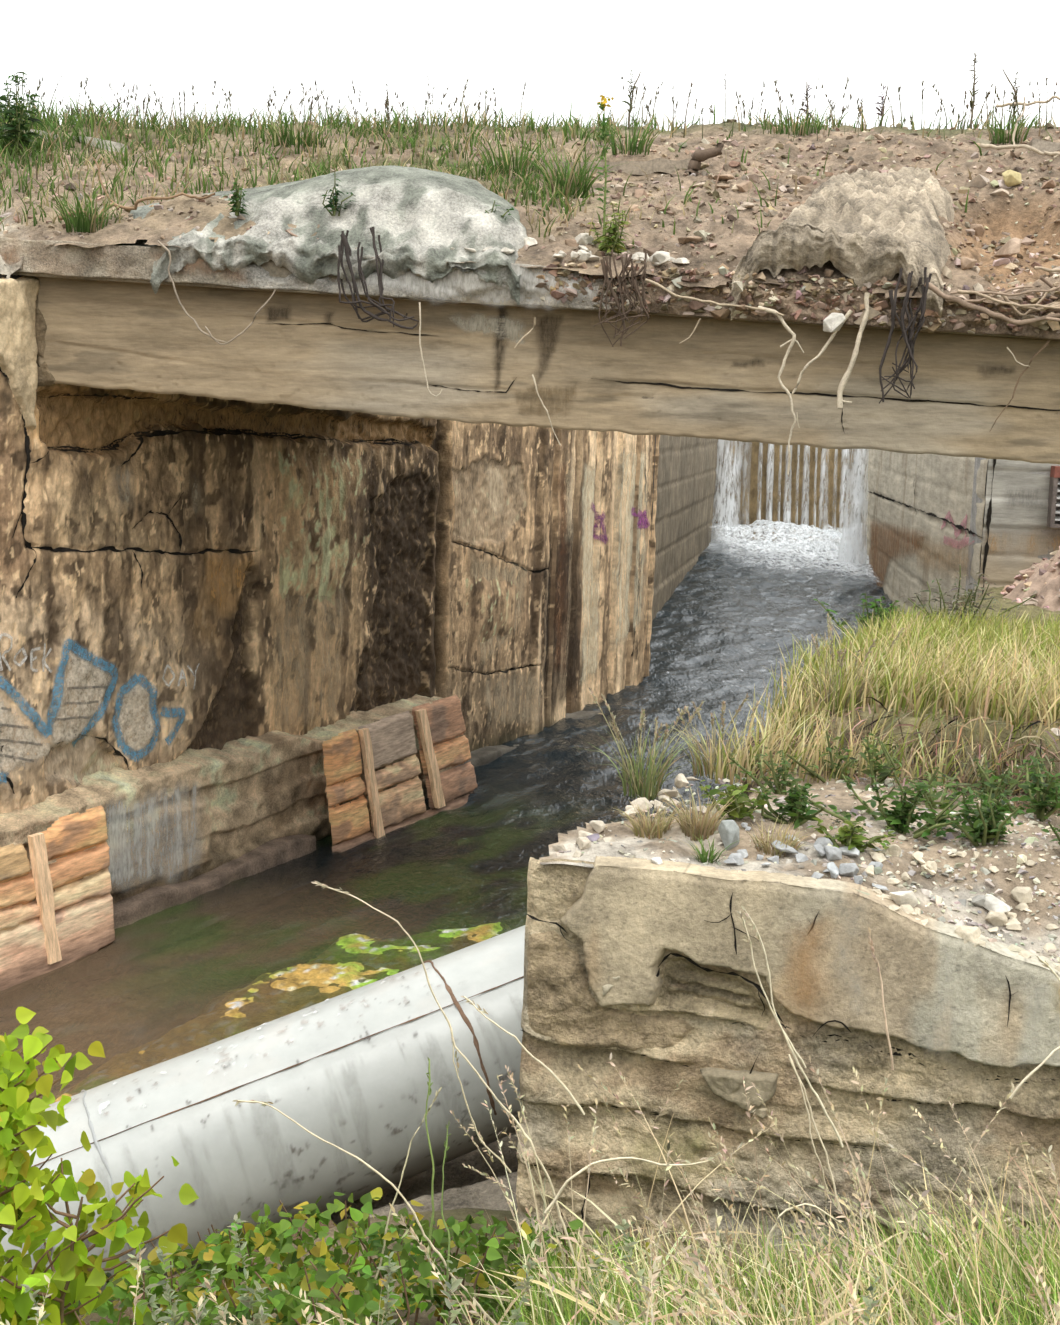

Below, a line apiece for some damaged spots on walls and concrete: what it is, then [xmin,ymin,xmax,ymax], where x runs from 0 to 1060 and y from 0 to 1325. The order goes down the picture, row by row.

crack [0,272,23,280]
crack [258,323,433,336]
crack [0,354,422,598]
crack [451,541,548,577]
crack [452,664,540,675]